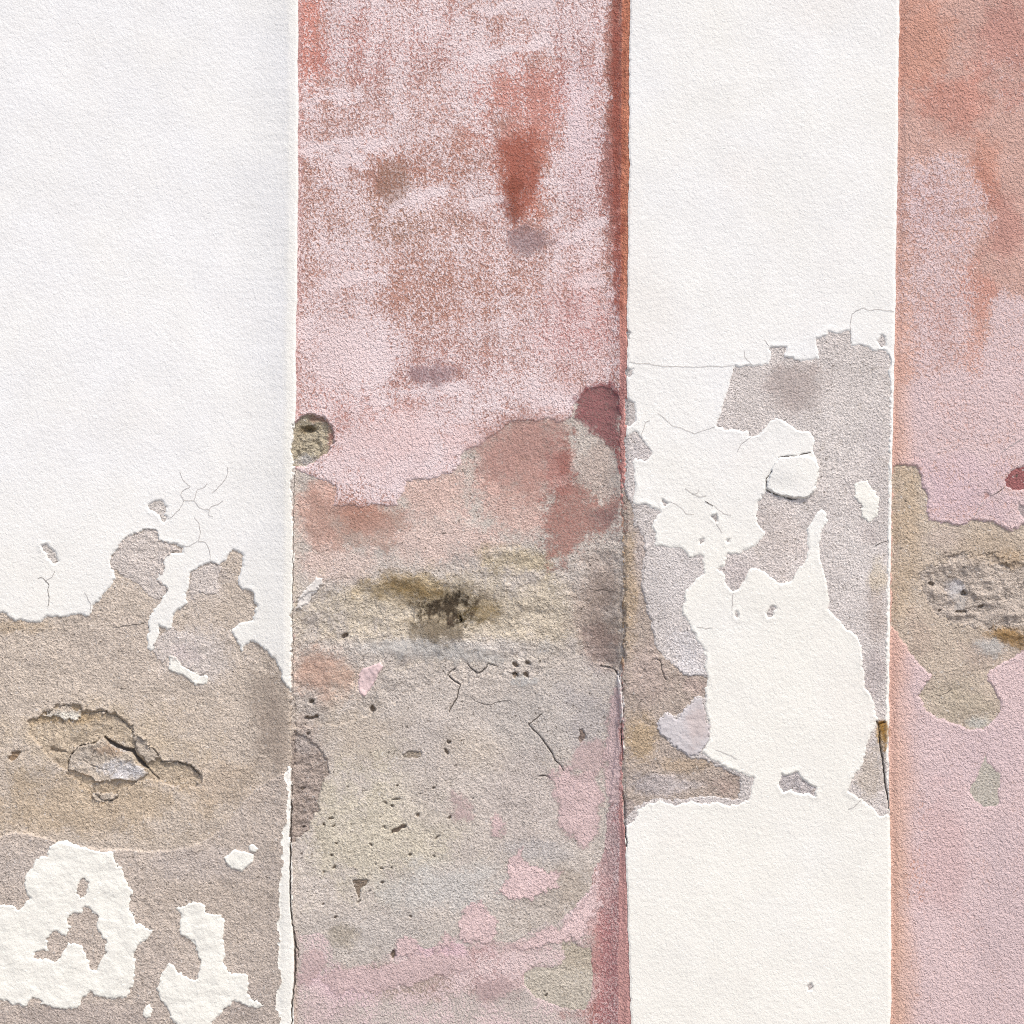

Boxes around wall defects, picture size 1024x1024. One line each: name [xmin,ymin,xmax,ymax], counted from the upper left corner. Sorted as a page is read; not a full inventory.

crack [170,468,228,558]
peeling [716,330,1024,816]
water stain [372,587,504,665]
peeling [0,390,754,1024]
crack [447,663,505,712]
crack [529,714,563,778]
corrosion [878,721,889,751]
crack [289,764,299,1024]